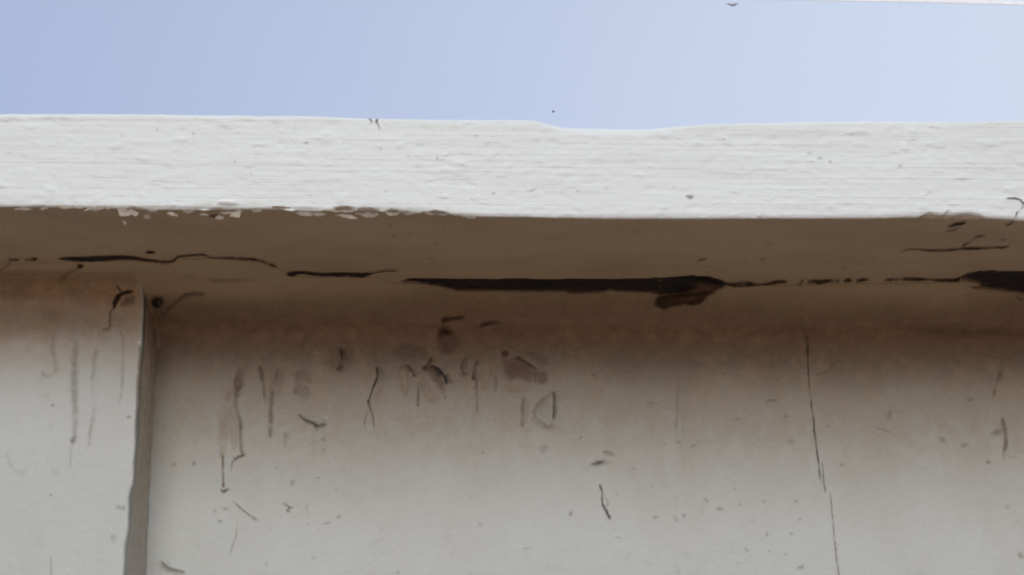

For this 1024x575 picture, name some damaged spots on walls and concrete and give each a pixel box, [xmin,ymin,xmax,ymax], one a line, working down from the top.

peeling [13,205,449,225]
crack [6,197,1024,309]
leakage [0,276,1024,517]
crack [811,401,824,478]